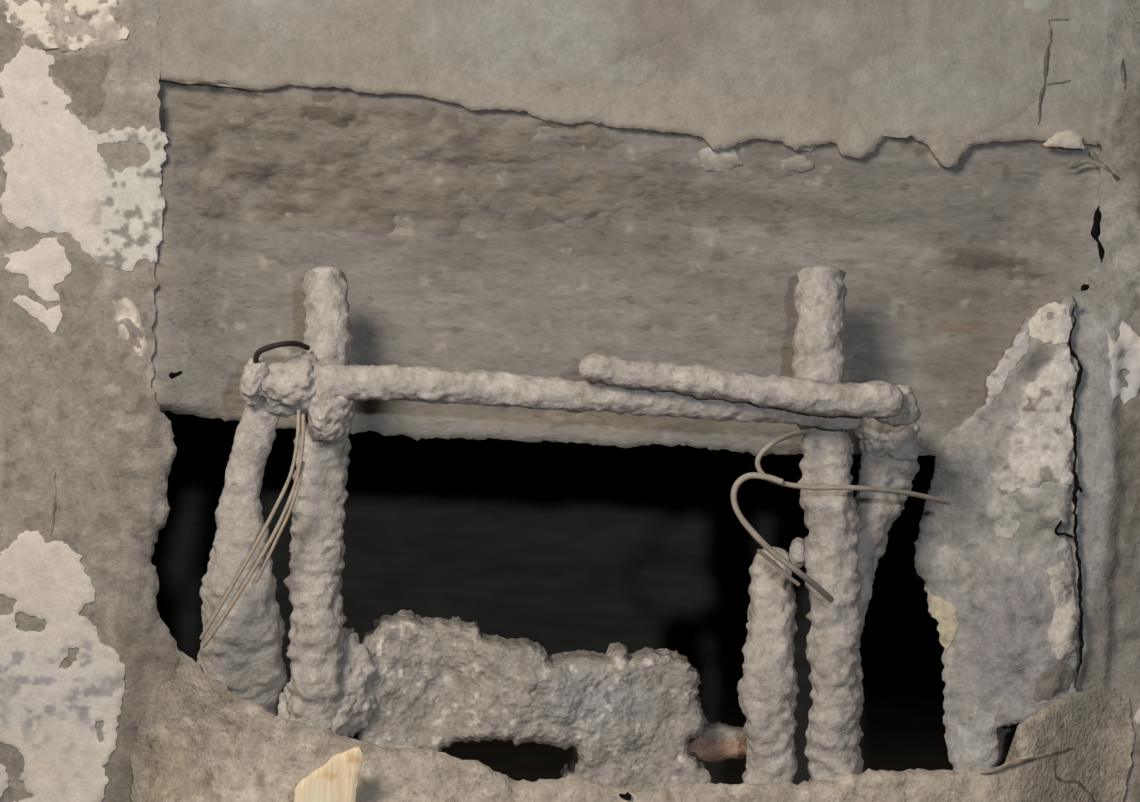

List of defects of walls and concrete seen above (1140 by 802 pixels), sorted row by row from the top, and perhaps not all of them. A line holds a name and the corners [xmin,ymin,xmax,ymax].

peeling [0,530,125,802]
spalling [0,0,815,552]
spalling [197,265,922,784]
peeling [1042,130,1084,149]
crack [1054,205,1104,687]
peeling [1106,321,1140,404]